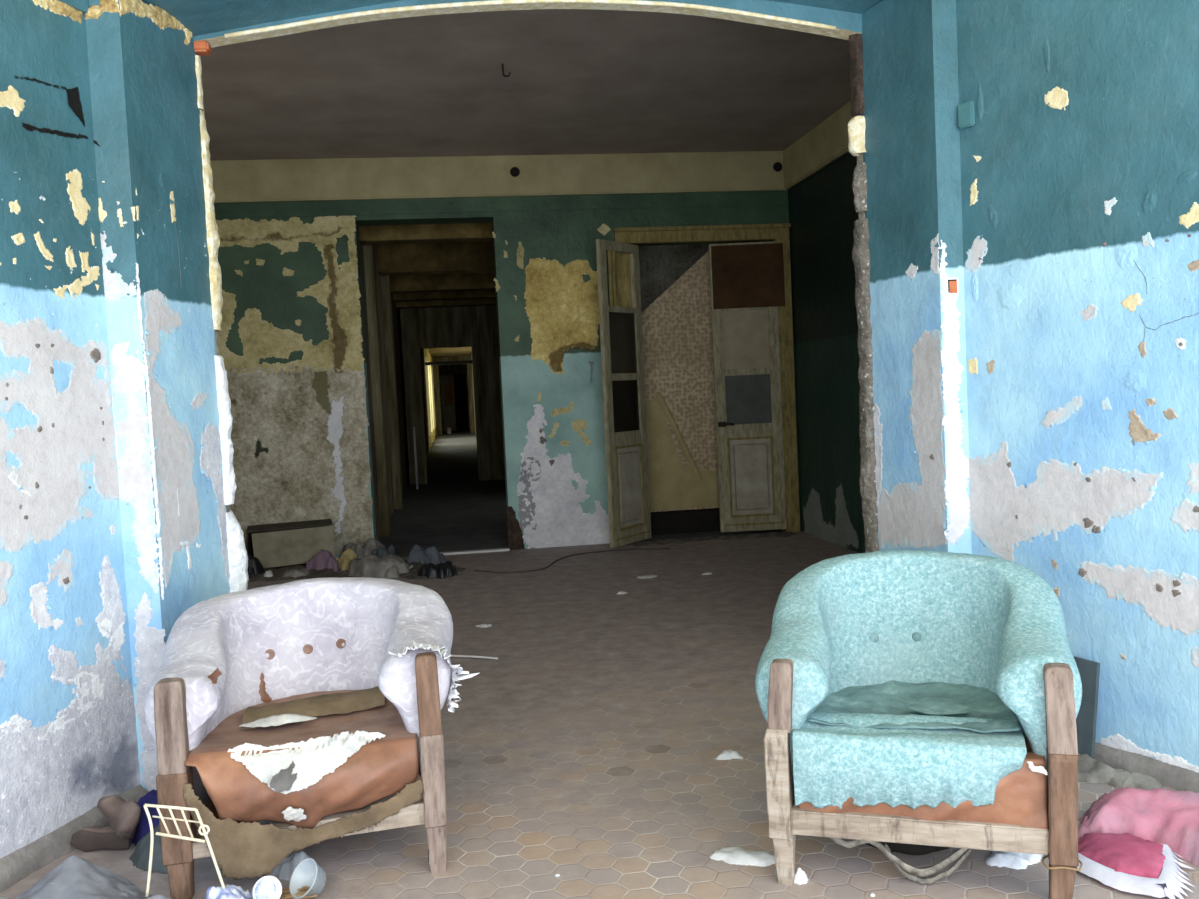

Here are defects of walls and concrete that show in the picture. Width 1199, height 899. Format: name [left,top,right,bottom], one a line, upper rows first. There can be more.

peeling [1142,232,1169,247]
peeling [1179,202,1199,237]
peeling [492,232,600,383]
peeling [847,33,1164,562]
crack [1140,313,1198,342]
peeling [0,0,373,858]
peeling [506,392,610,550]
flaking render [1128,398,1179,445]
peeling [1170,462,1199,534]
peeling [1079,561,1199,668]